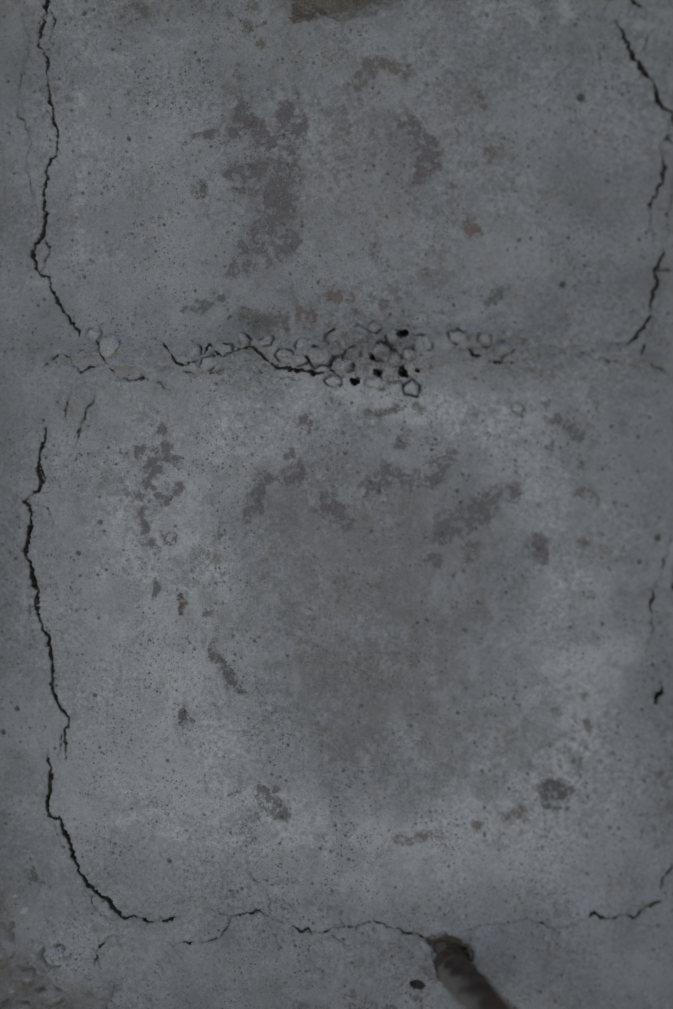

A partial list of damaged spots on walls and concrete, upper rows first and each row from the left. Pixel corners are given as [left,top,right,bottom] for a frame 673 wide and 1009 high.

crack [620,29,673,216]
crack [31,0,163,388]
crack [627,253,669,370]
crack [163,344,333,376]
crack [460,349,502,364]
crack [649,559,673,623]
crack [23,400,259,945]
crack [654,687,663,704]
crack [589,863,673,919]
crack [295,922,423,937]
corrosion [426,933,475,962]